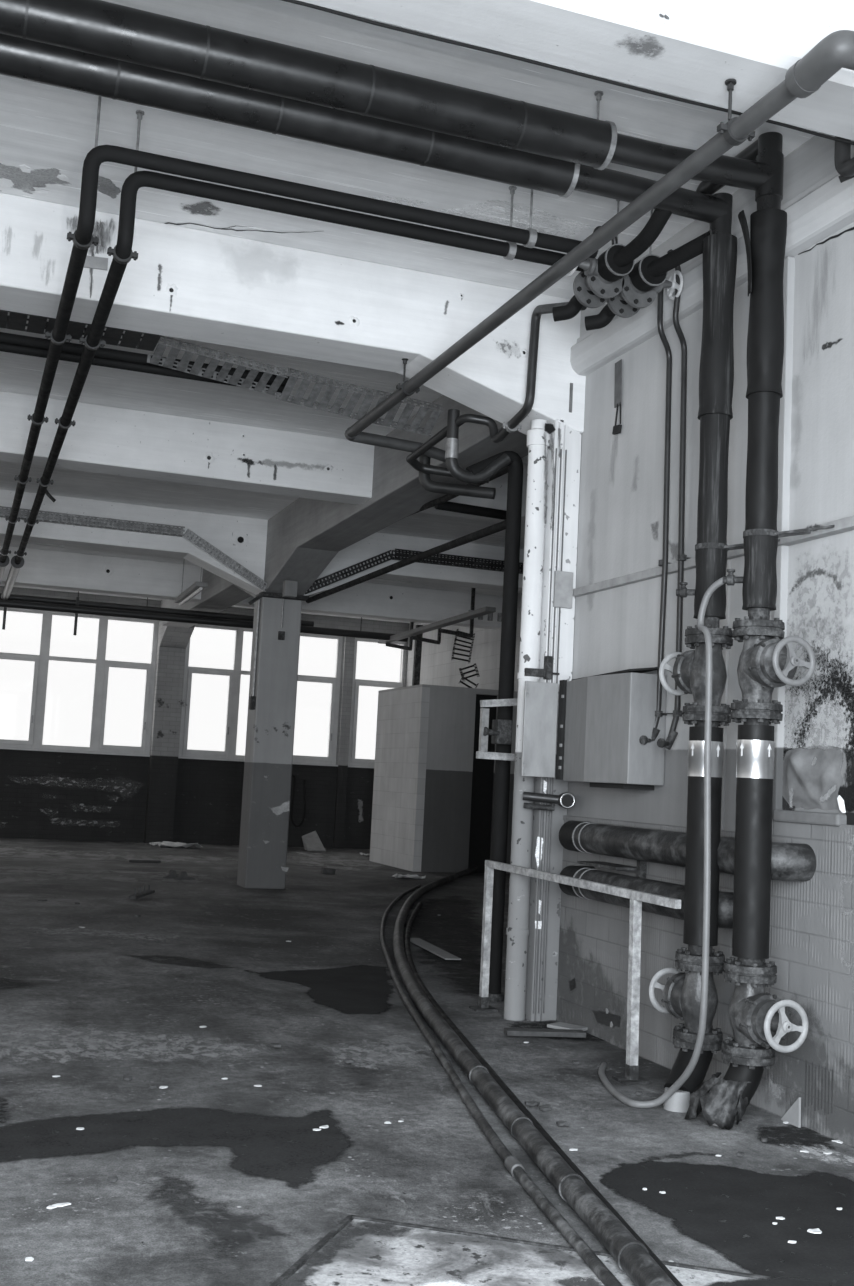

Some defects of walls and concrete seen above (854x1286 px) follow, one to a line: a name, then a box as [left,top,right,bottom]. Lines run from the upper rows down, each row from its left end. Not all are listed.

peeling [0,164,69,194]
peeling [98,176,121,198]
leakage [792,569,841,591]
leakage [783,641,854,813]
leakage [133,955,394,1014]
leakage [0,1099,351,1189]
leakage [600,1152,854,1286]